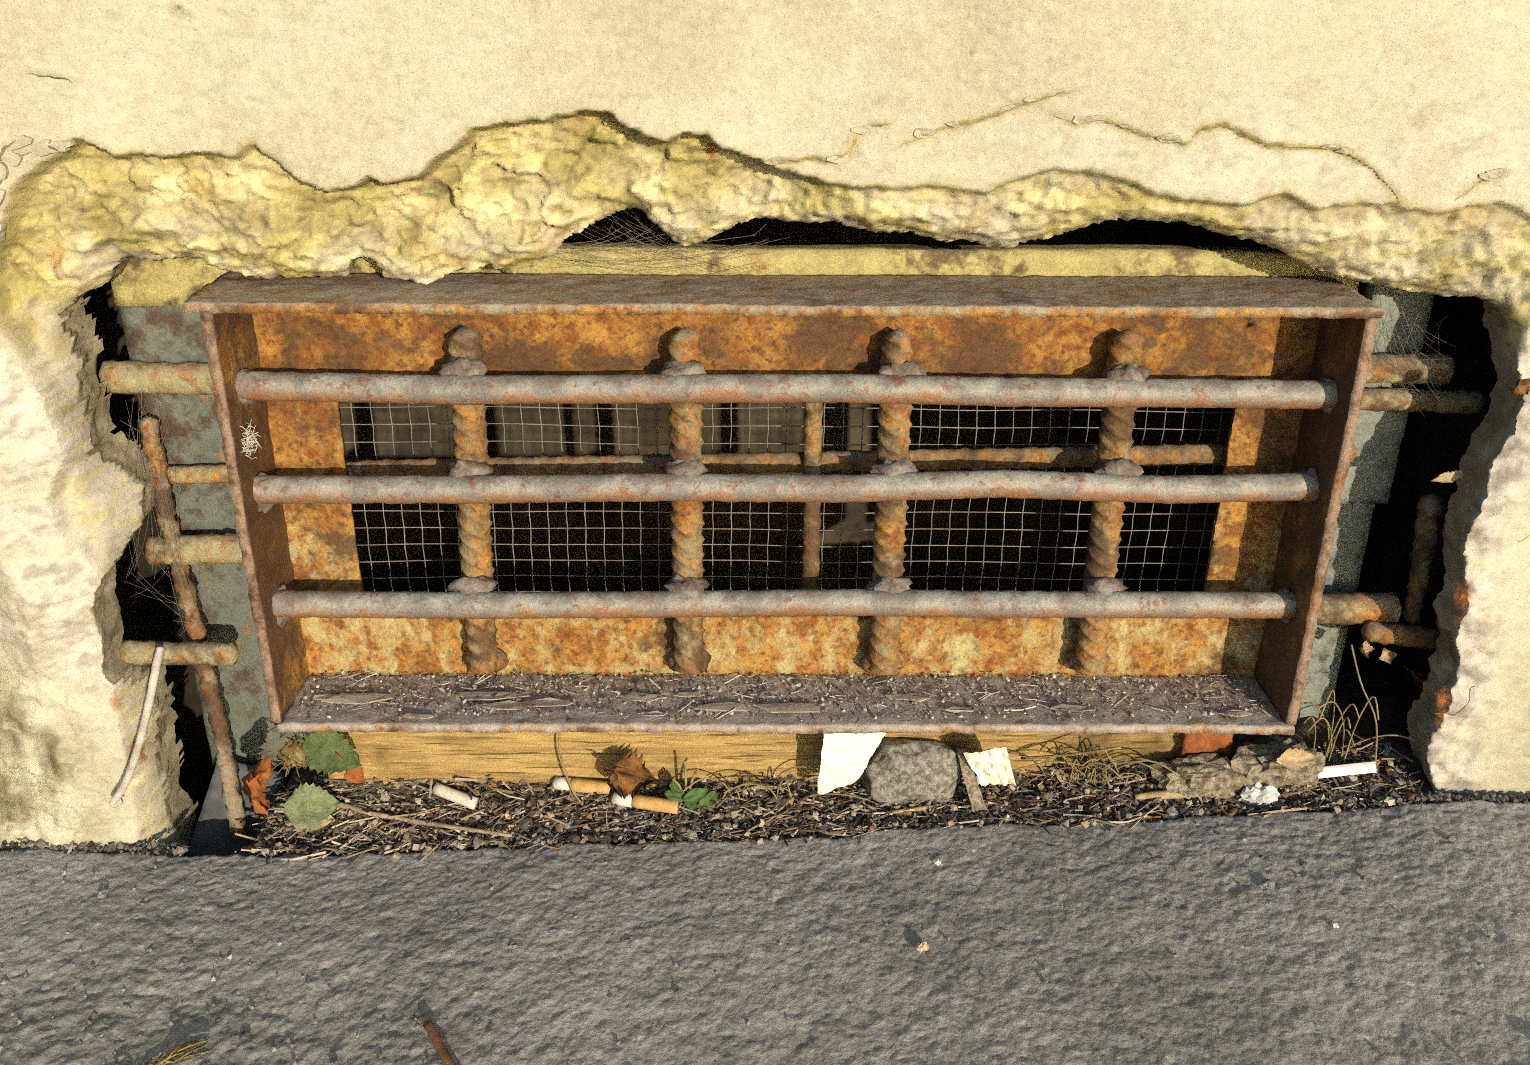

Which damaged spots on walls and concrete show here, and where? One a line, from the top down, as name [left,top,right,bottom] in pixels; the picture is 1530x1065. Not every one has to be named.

flaking render [0,91,1530,427]
peeling [313,693,392,704]
peeling [458,691,576,710]
peeling [1050,704,1095,712]
peeling [1215,709,1252,717]
leakage [46,745,60,777]
flaking render [114,663,199,857]